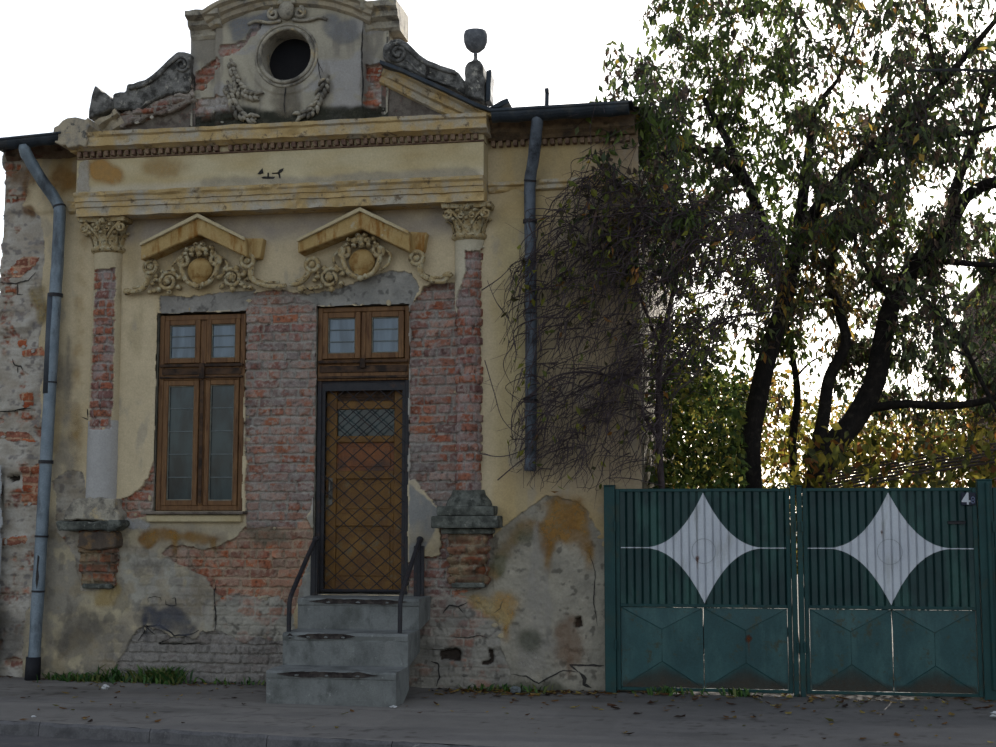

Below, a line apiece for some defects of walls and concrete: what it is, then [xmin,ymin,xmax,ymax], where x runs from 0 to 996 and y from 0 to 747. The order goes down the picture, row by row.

flaking render [120,25,262,124]
flaking render [89,267,117,430]
flaking render [0,152,45,677]
peeling [115,246,605,691]
flaking render [52,470,121,591]
water stain [143,606,194,635]
crack [138,585,217,645]
crack [590,556,598,625]
crack [513,664,604,688]